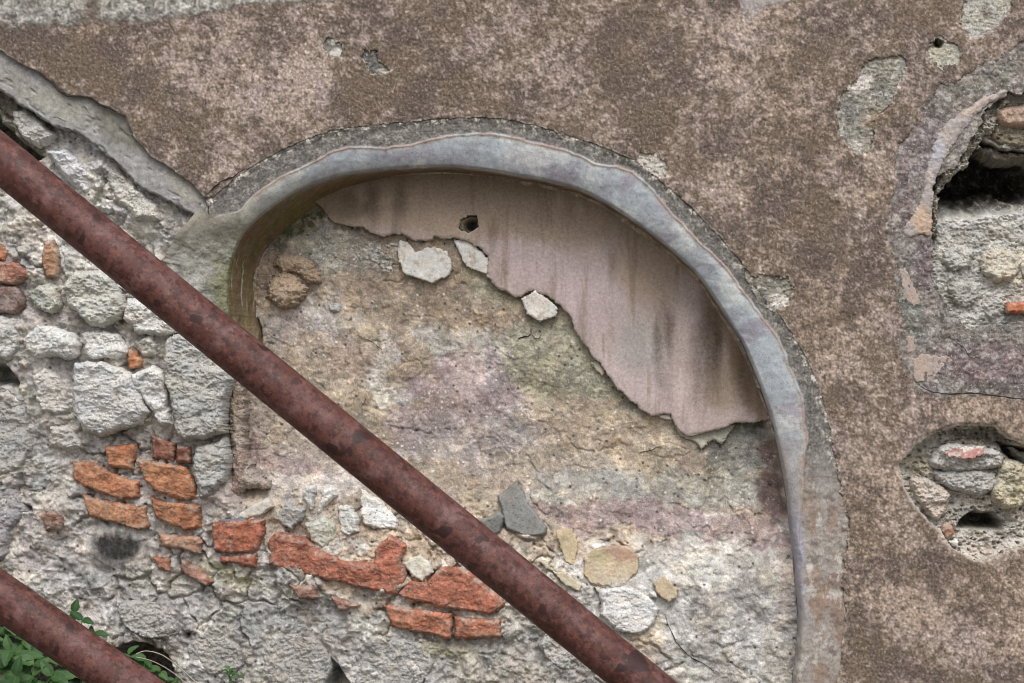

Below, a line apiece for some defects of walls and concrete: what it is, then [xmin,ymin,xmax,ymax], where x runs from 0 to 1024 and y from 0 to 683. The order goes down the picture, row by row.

flaking render [837,55,907,156]
flaking render [880,0,1024,406]
flaking render [397,239,489,284]
flaking render [521,290,558,322]
flaking render [745,271,795,312]
flaking render [658,414,735,449]
flaking render [899,425,1024,561]
flaking render [539,528,640,592]
flaking render [653,576,679,602]